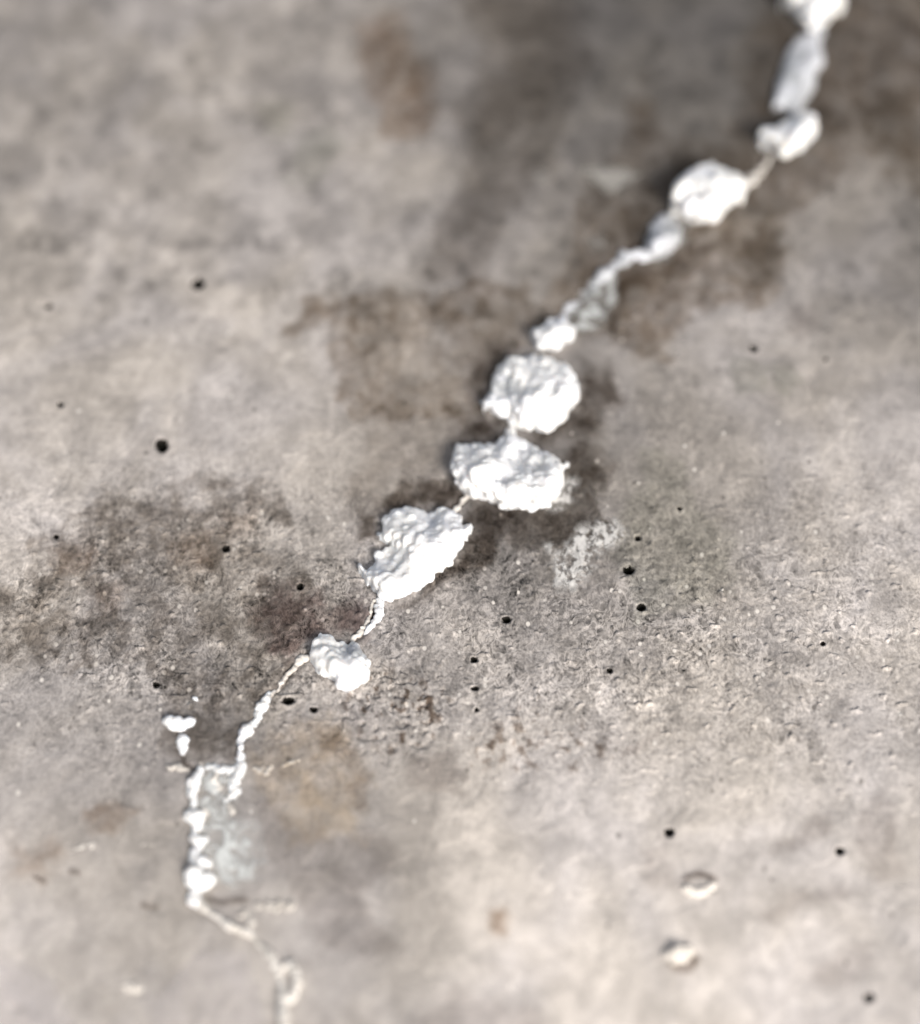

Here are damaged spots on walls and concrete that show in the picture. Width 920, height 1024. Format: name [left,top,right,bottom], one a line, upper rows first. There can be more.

crack [807,27,824,40]
efflorescence [758,0,845,159]
crack [745,149,776,188]
efflorescence [644,162,747,260]
crack [558,249,652,321]
damp [358,282,623,603]
crack [453,493,470,512]
crack [350,597,385,642]
efflorescence [309,633,371,693]
efflorescence [162,715,196,733]
efflorescence [203,773,255,883]
crack [165,654,310,1024]